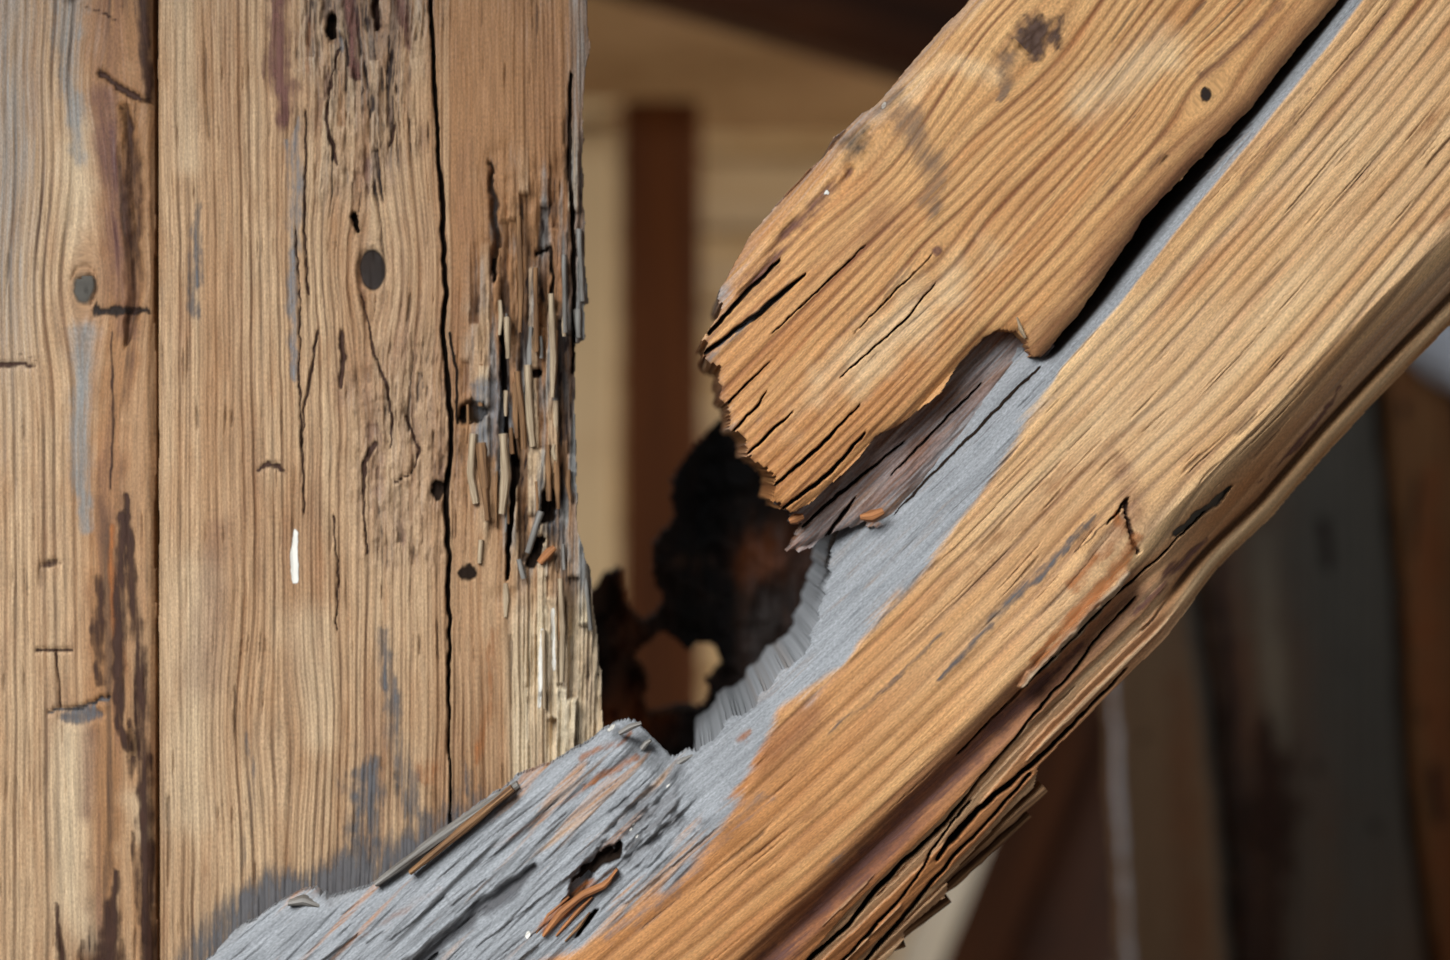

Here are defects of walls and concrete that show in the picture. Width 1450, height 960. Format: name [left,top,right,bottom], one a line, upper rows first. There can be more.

crack [429,0,459,803]
peeling [465,229,585,708]
crack [704,246,864,454]
crack [774,276,1041,537]
crack [806,498,1203,960]